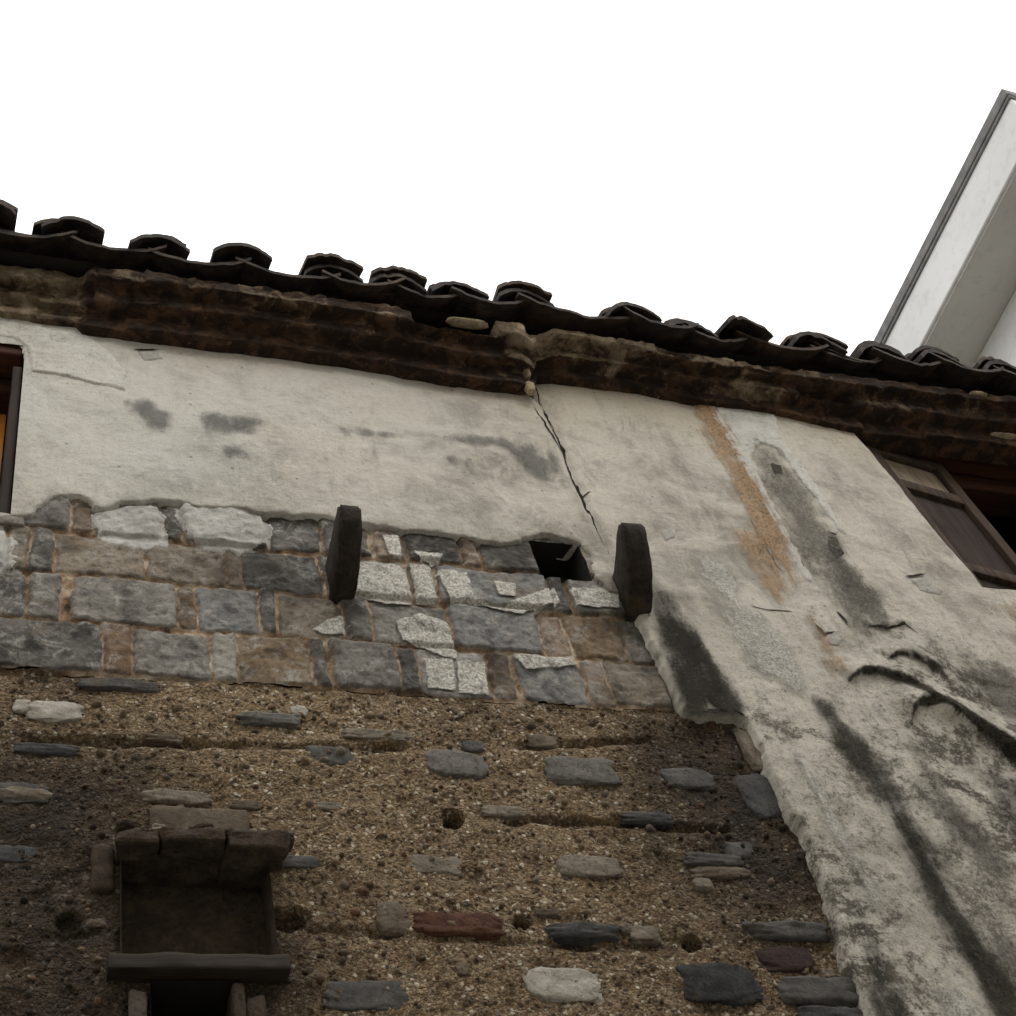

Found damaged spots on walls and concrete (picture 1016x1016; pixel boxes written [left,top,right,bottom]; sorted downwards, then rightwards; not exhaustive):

flaking render [0,495,677,713]
crack [532,388,610,555]
water stain [657,596,743,715]
corrosion [694,405,793,600]
water stain [761,453,888,636]
water stain [848,651,1016,762]
water stain [813,698,1016,1016]